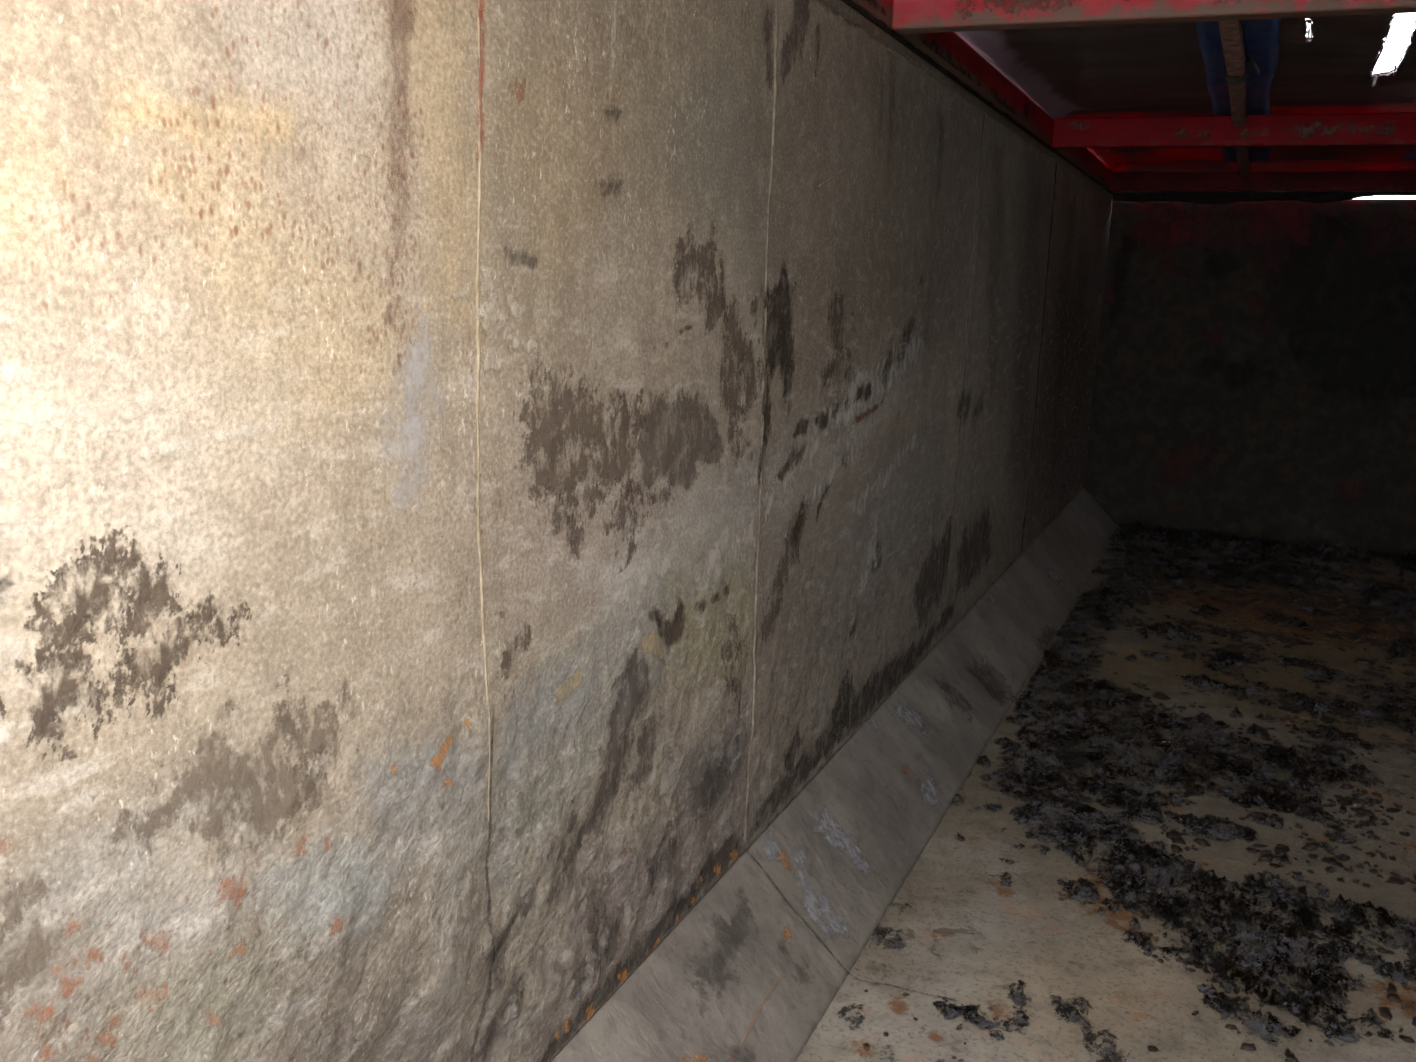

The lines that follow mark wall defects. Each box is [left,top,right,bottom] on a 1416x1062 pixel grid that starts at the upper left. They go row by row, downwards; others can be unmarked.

peeling [957,0,1079,20]
damp [510,225,873,645]
damp [913,509,991,632]
rust [430,736,453,787]